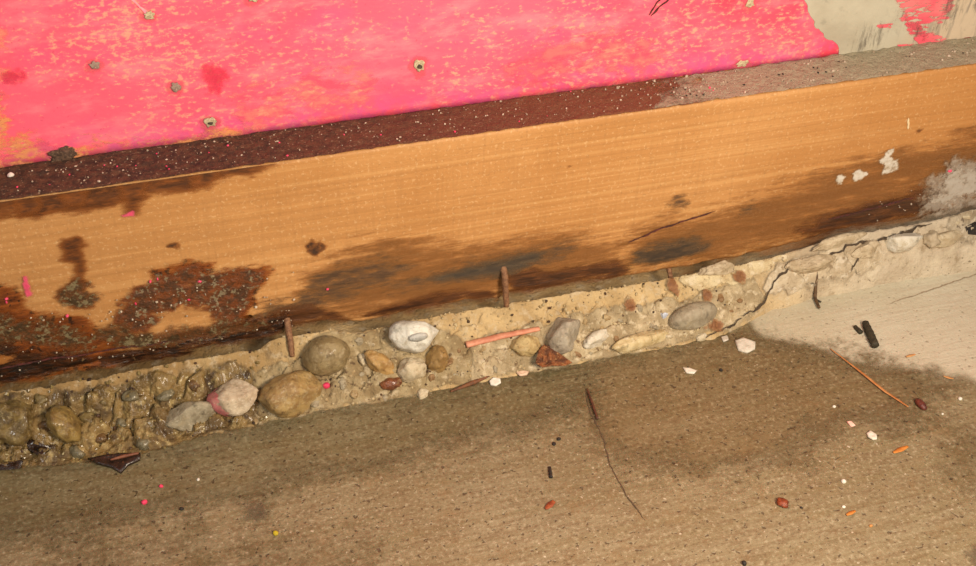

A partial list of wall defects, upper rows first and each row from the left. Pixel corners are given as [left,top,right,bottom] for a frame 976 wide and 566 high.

peeling [805,0,976,54]
leakage [0,126,976,385]
crack [706,268,789,338]
crack [829,197,932,270]
crack [886,274,976,305]
leakage [0,322,976,566]